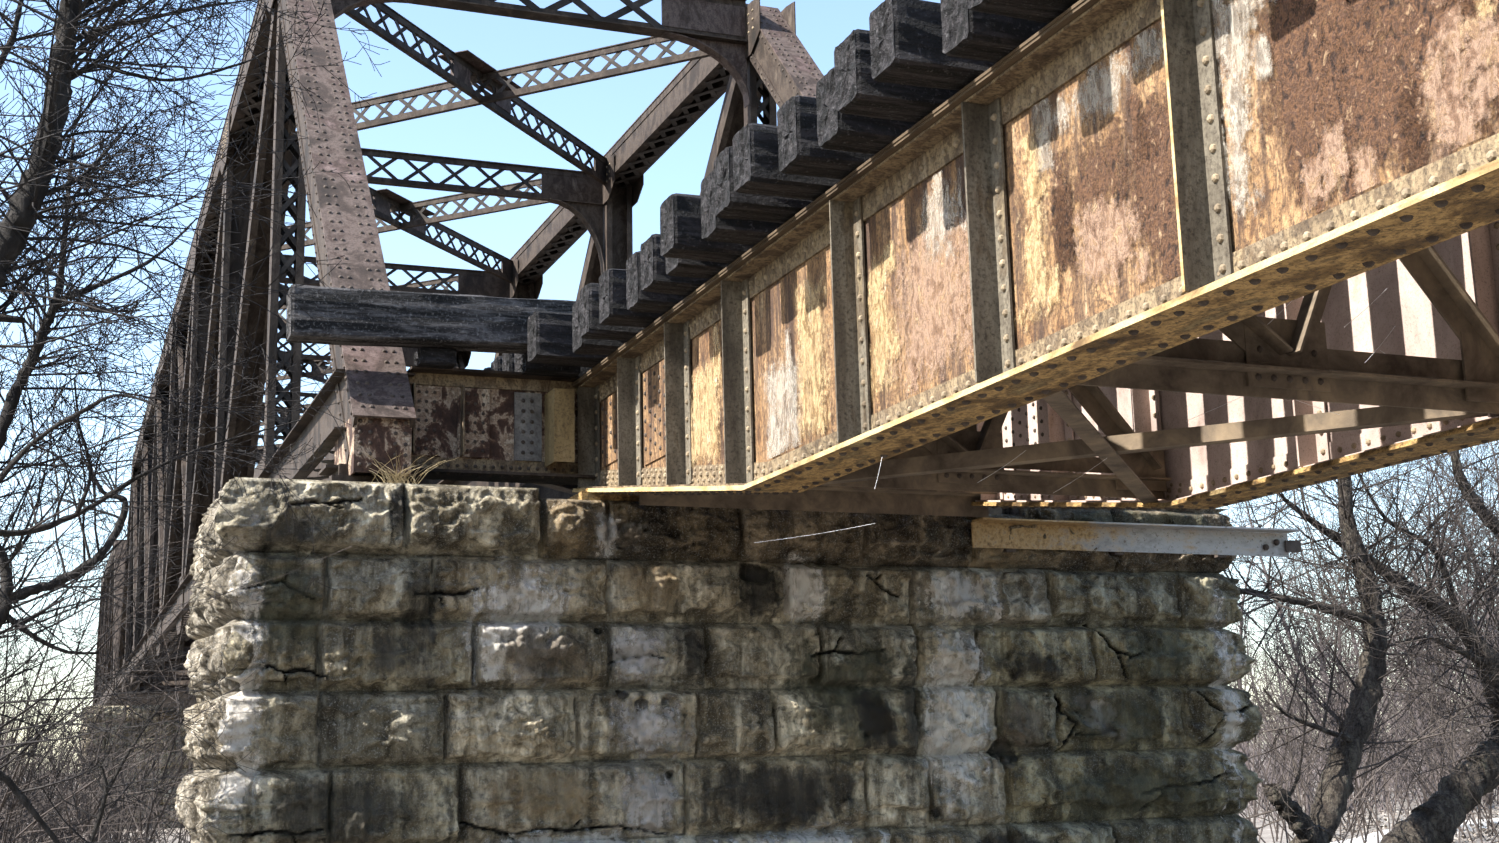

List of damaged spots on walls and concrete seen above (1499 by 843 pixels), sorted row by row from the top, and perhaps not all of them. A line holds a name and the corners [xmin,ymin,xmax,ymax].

corrosion [1250,0,1499,214]
corrosion [1049,84,1181,288]
crack [249,664,327,682]
crack [810,637,885,658]
crack [1082,624,1135,679]